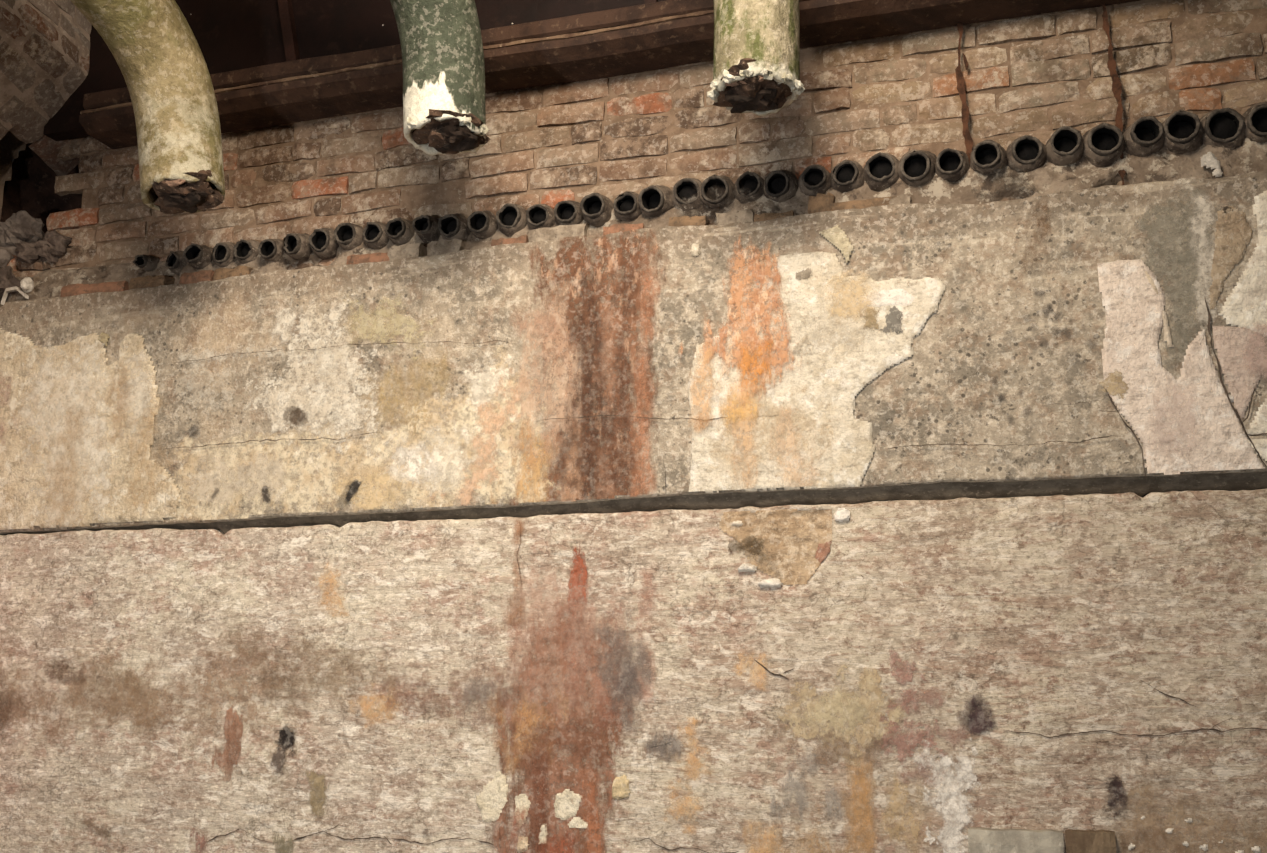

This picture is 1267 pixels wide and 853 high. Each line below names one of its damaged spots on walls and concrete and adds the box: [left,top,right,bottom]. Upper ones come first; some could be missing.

spalling [0,143,83,240]
corrosion [510,229,663,506]
corrosion [693,239,794,482]
peeling [669,192,946,493]
peeling [1097,191,1267,475]
crack [1205,298,1267,467]
spalling [719,508,850,588]
corrosion [489,547,633,853]